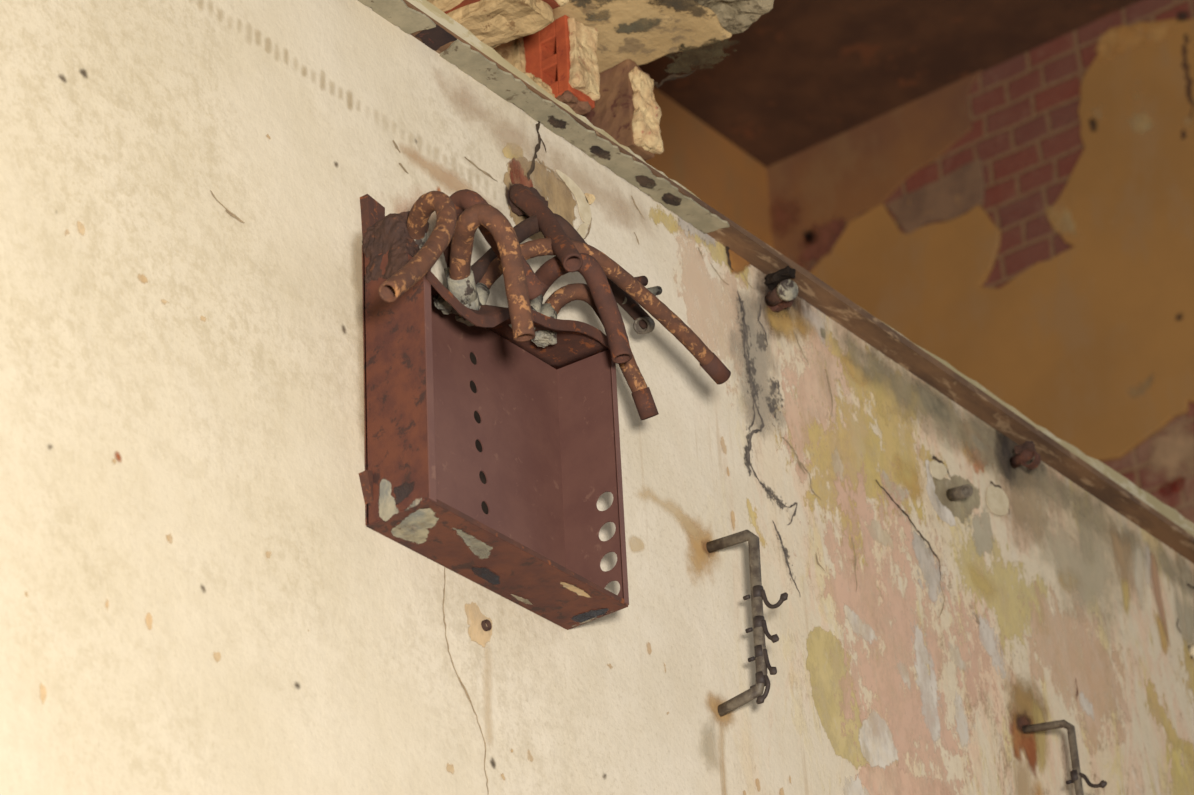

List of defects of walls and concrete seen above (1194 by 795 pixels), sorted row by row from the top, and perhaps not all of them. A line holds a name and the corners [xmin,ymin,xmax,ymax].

spalling [572,0,774,74]
peeling [1095,12,1187,62]
peeling [548,116,567,129]
crack [1181,34,1194,139]
crack [698,246,833,594]
corrosion [645,493,715,572]
peeling [772,318,1048,795]
crack [876,480,945,617]
crack [443,571,489,795]
peeling [1144,679,1194,769]
peeling [1179,635,1194,704]